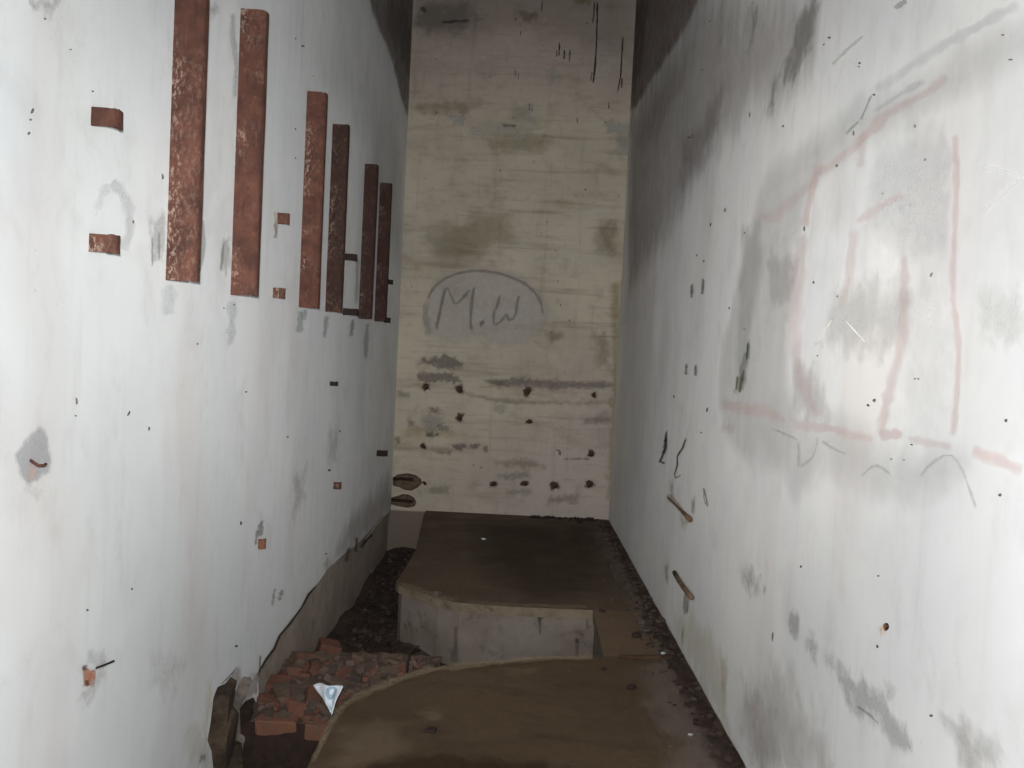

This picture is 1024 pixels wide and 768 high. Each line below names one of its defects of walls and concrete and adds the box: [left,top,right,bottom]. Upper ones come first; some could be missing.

peeling [18,431,50,481]